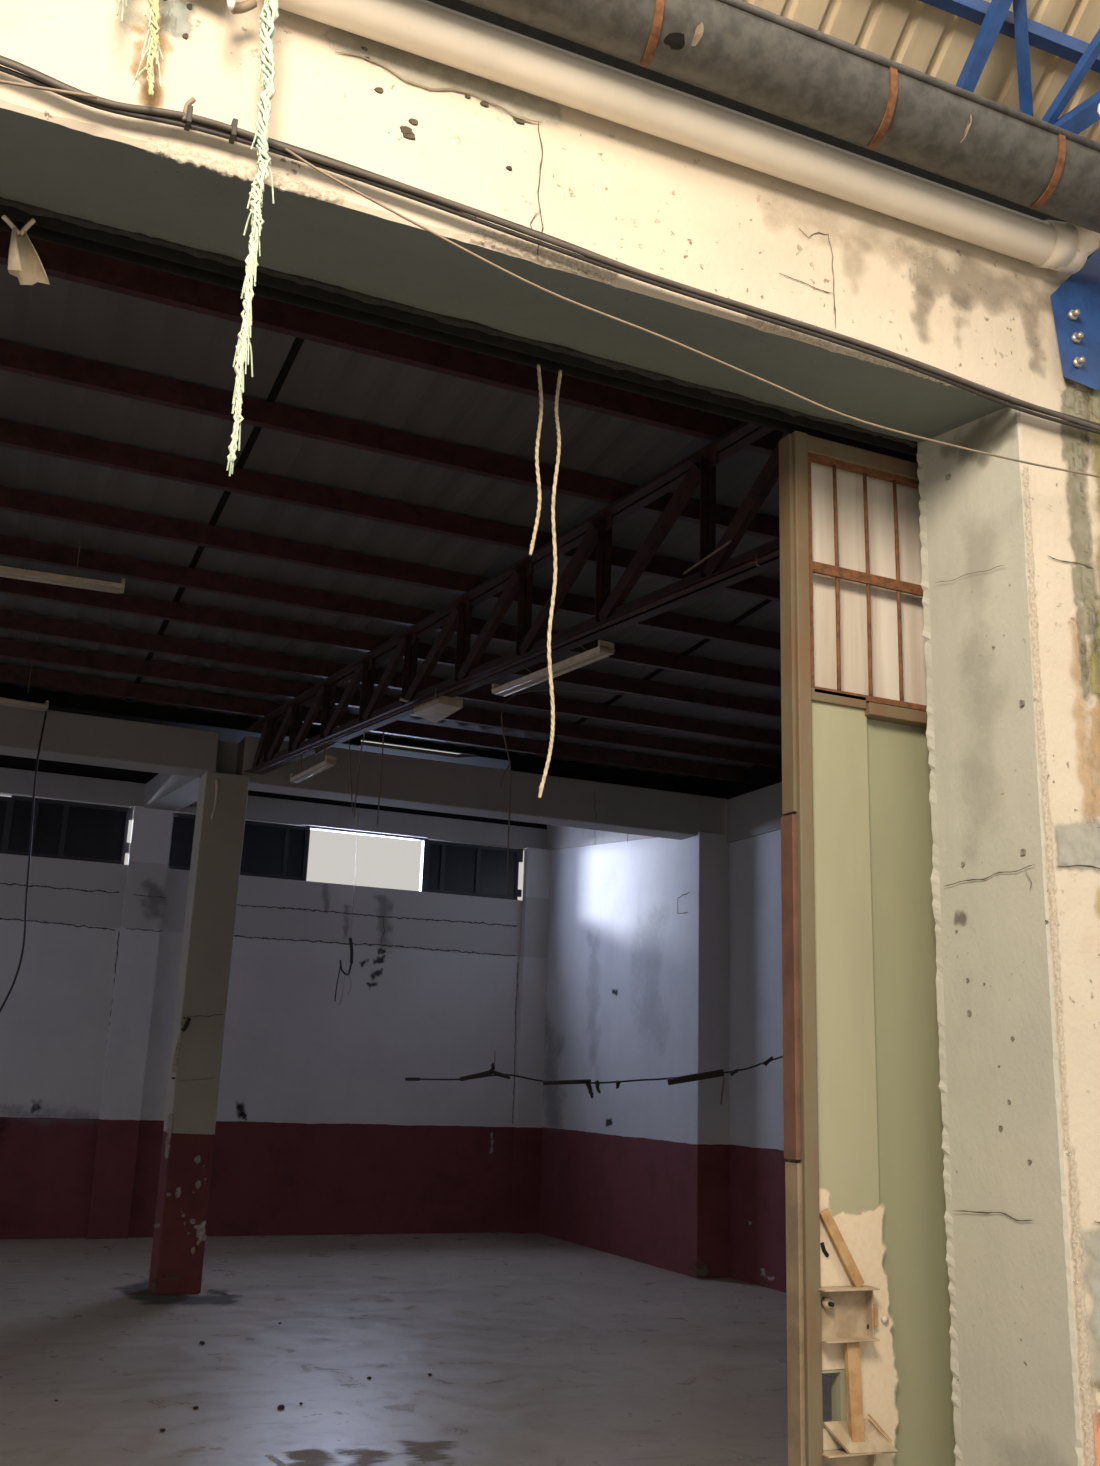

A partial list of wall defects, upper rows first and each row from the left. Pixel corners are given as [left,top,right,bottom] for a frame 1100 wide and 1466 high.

peeling [326,28,560,125]
peeling [400,118,418,140]
crack [530,122,543,255]
crack [779,232,836,328]
leakage [916,257,1052,366]
crack [945,864,1100,888]
peeling [166,1155,207,1254]
crack [960,1210,1032,1221]
peeling [819,1188,899,1466]